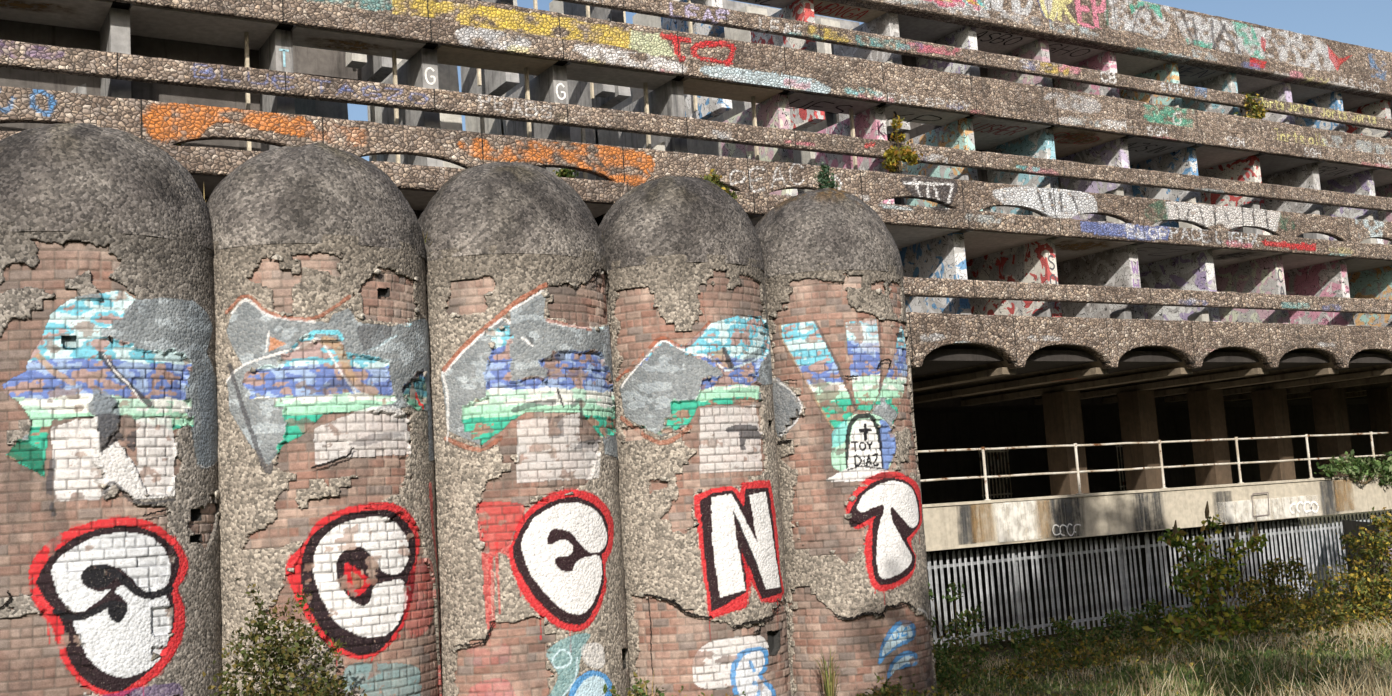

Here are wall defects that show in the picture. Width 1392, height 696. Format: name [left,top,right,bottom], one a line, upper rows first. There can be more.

spalling [247,252,343,316]
spalling [353,267,421,324]
spalling [446,276,495,318]
spalling [0,239,170,696]
spalling [102,415,190,466]
spalling [188,490,220,550]
spalling [243,395,411,550]
spalling [475,411,600,555]
spalling [541,269,917,564]
spalling [263,531,556,696]